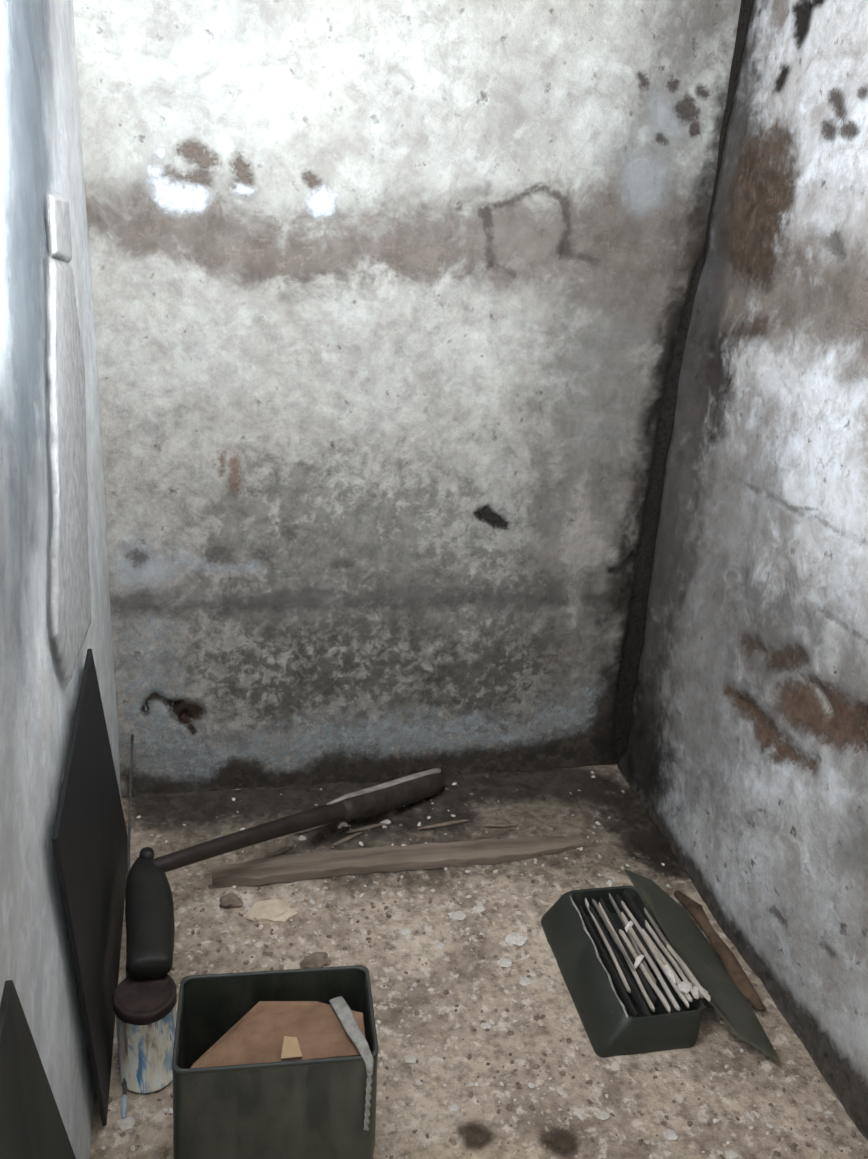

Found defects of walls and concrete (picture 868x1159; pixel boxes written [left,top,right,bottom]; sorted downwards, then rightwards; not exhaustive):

water stain [86,198,122,231]
peeling [147,139,254,215]
peeling [304,171,336,218]
water stain [119,114,724,533]
crack [608,0,754,763]
water stain [597,0,868,1141]
water stain [125,618,547,784]
spalling [724,635,868,772]
water stain [121,716,610,844]